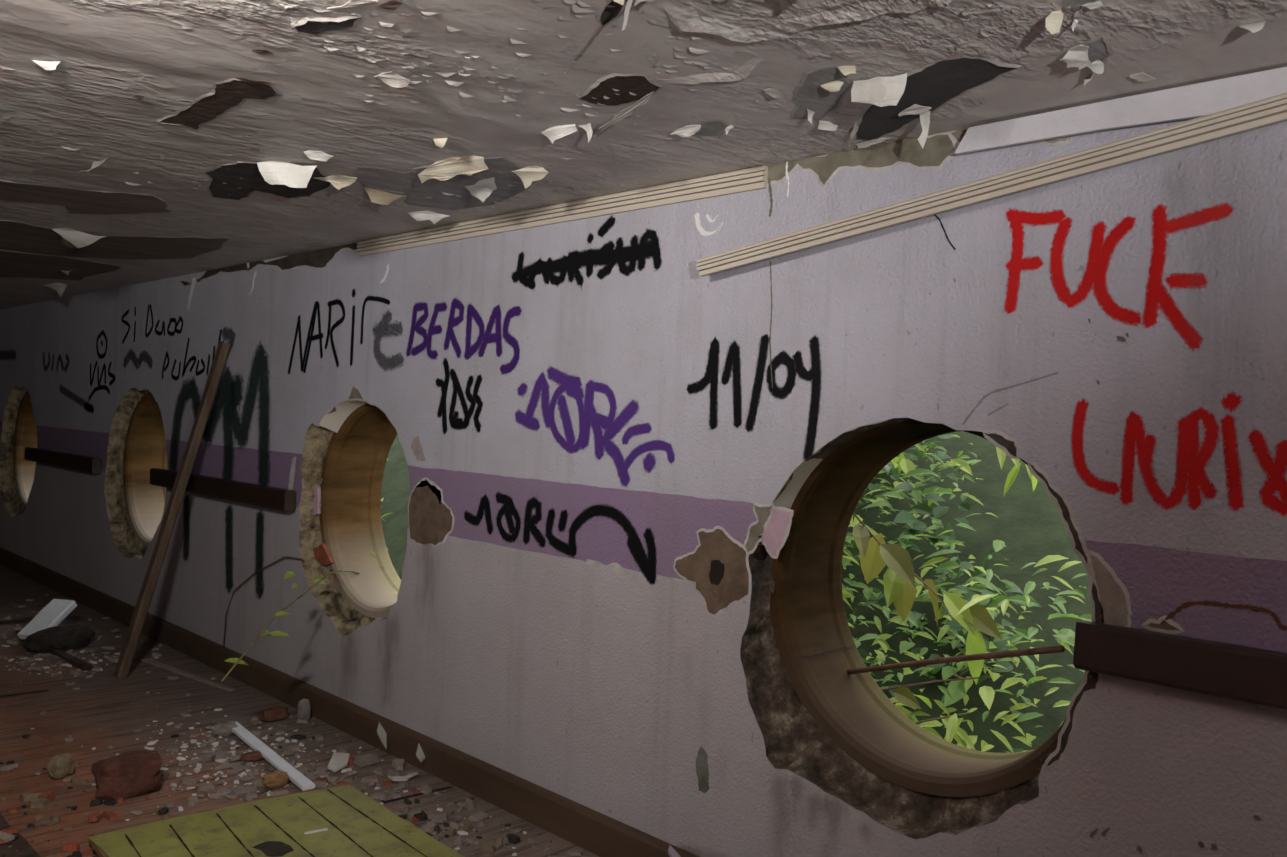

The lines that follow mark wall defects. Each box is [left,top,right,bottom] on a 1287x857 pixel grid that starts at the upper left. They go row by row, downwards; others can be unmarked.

peeling [32,43,60,70]
peeling [132,0,743,224]
peeling [650,0,1114,188]
peeling [1237,21,1266,49]
peeling [0,136,231,298]
flaking render [173,243,359,287]
flaking render [104,387,167,559]
flaking render [286,384,454,637]
flaking render [810,418,925,459]
flaking render [952,428,1185,634]
flaking render [587,473,1102,839]